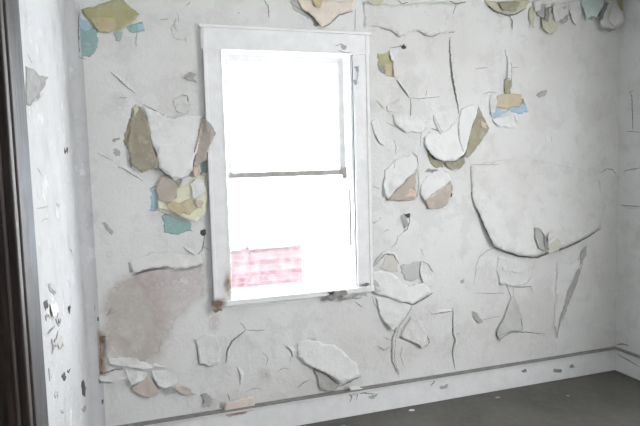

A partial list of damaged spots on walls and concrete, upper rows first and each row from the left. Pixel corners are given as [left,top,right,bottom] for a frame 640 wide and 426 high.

peeling [74,0,145,60]
peeling [290,0,465,37]
peeling [484,0,625,34]
peeling [25,56,48,106]
crack [449,37,460,114]
peeling [376,45,528,209]
peeling [112,94,216,256]
peeling [327,213,434,374]
leakage [98,336,106,383]
peeling [98,356,213,407]
crack [226,323,260,392]